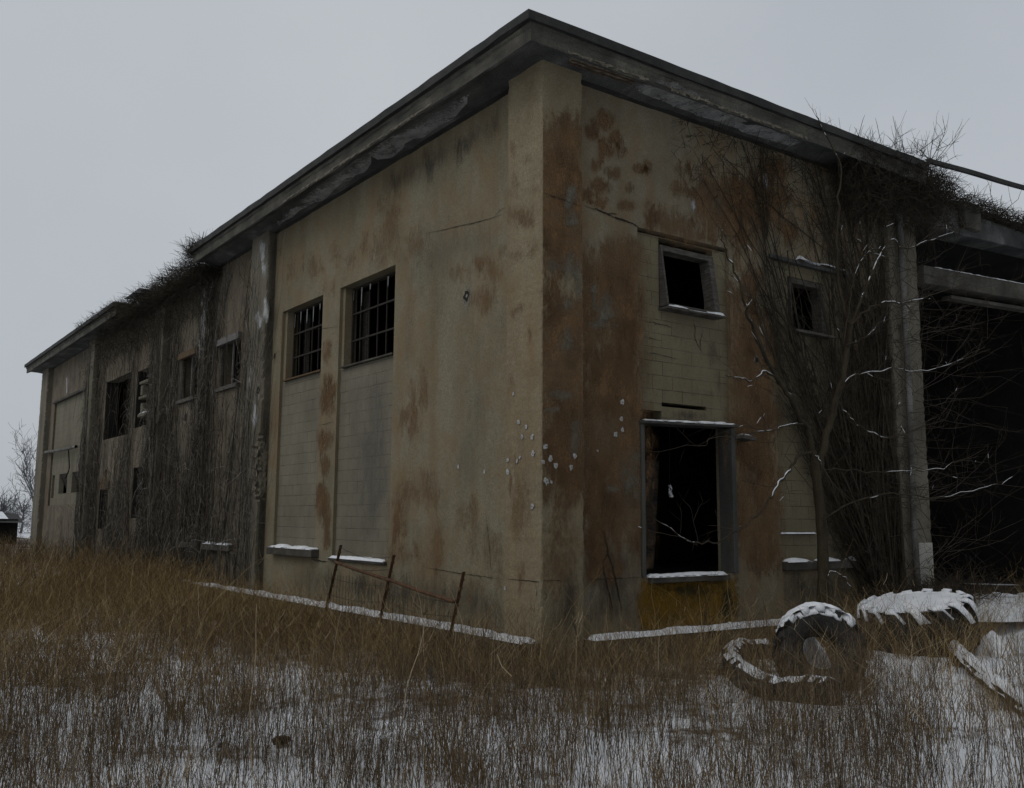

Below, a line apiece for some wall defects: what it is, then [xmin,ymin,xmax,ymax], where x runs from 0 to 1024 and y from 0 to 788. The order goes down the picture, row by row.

spalling [283,102,432,203]
crack [546,193,641,230]
peeling [506,108,634,509]